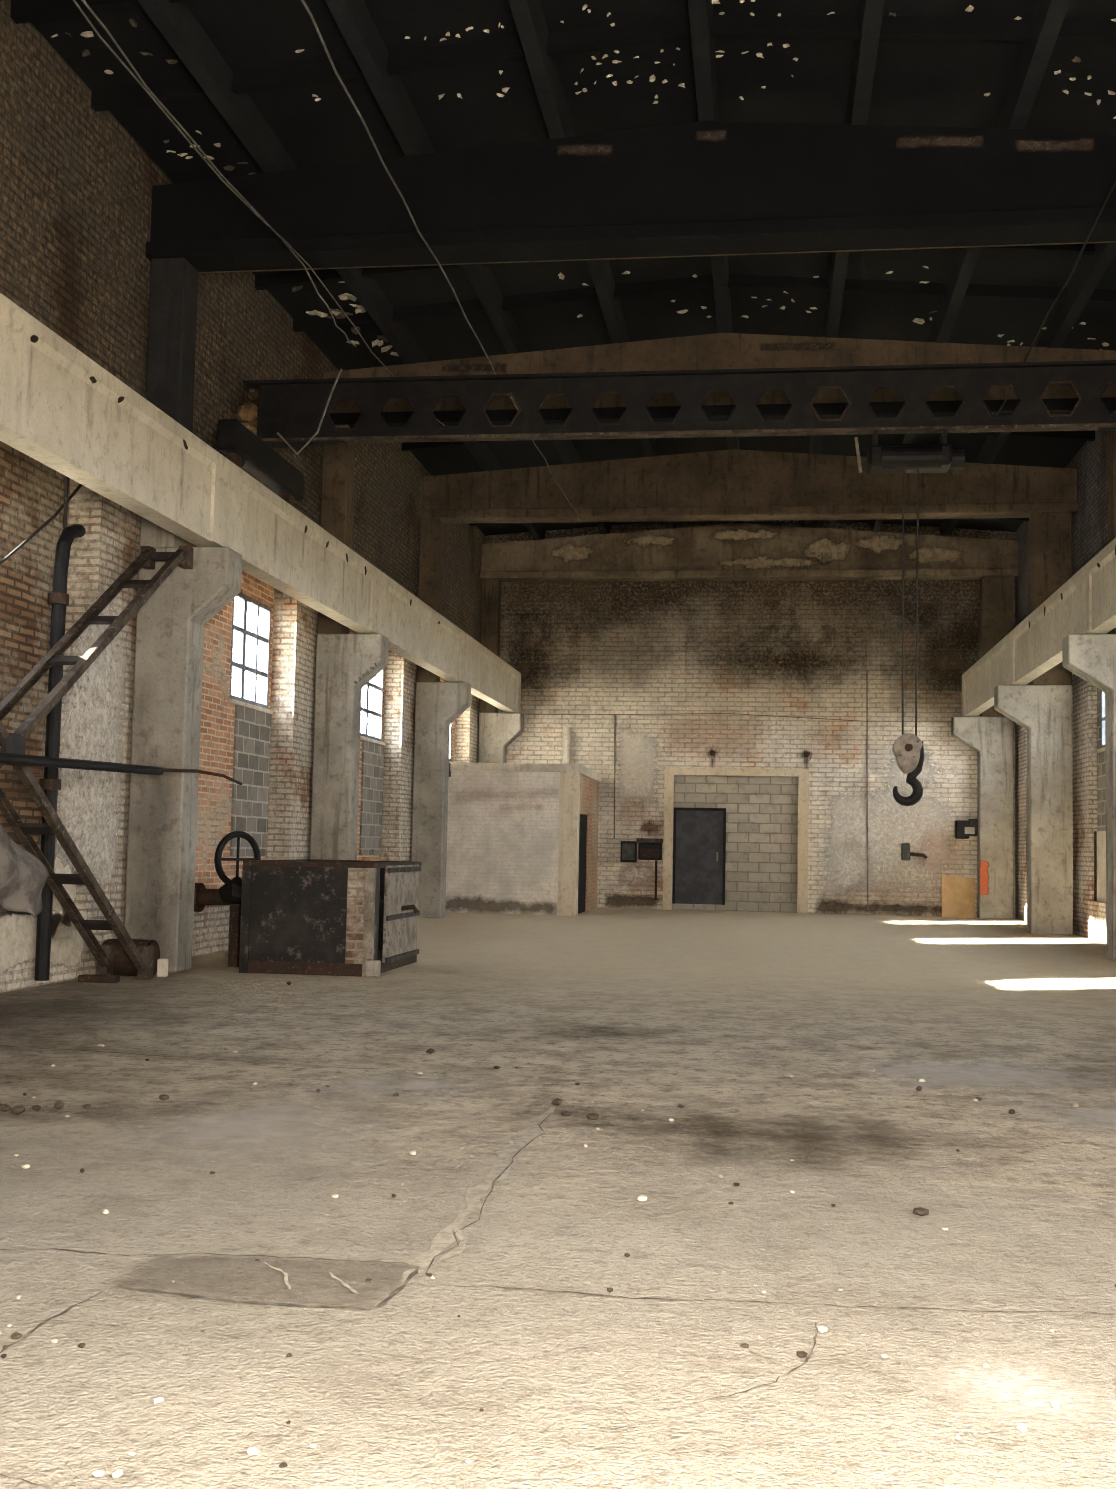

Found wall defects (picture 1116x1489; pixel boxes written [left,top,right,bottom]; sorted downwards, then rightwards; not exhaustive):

peeling [574,47,685,104]
peeling [716,42,798,77]
peeling [163,130,256,175]
peeling [552,544,593,563]
peeling [623,535,674,548]
peeling [712,529,962,570]
water stain [506,633,554,699]
water stain [712,641,851,680]
crack [0,1112,1116,1403]
crack [0,1474,51,1489]